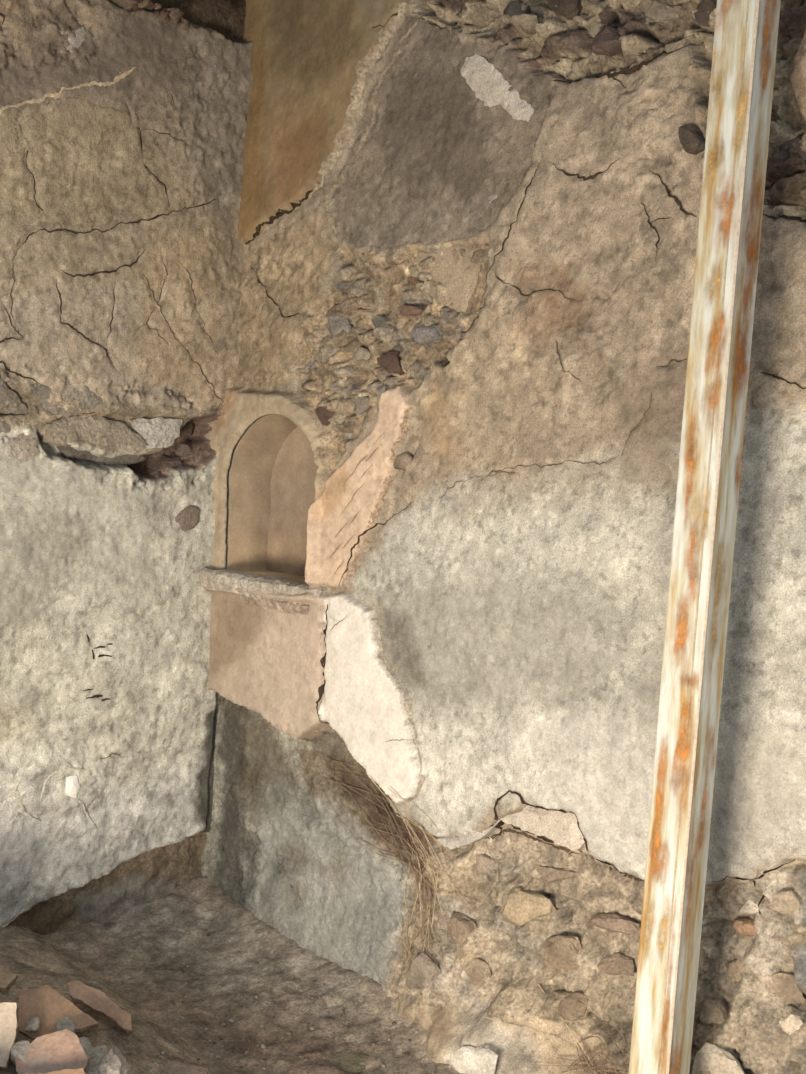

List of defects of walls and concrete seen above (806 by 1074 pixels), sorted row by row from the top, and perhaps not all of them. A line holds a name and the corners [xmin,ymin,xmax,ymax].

flaking render [763,0,806,220]
crack [0,100,216,387]
crack [56,250,223,407]
crack [245,190,313,318]
flaking render [294,0,717,473]
corrosion [710,315,746,392]
corrosion [685,428,708,592]
corrosion [674,605,687,652]
crack [490,790,639,879]
corrosion [652,729,690,875]
flaking render [390,828,644,1074]
flaking render [689,864,806,1074]